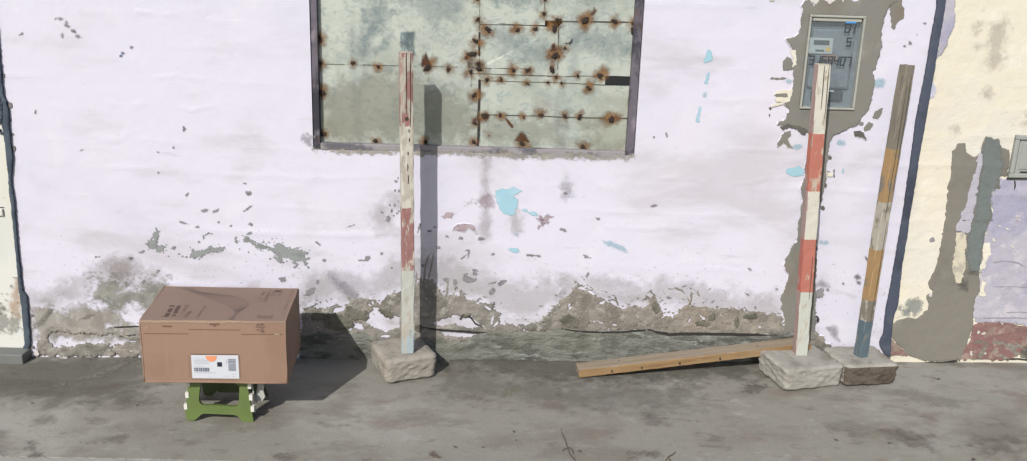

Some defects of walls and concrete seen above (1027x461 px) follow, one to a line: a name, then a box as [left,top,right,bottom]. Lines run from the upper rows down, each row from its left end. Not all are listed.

corrosion [579,8,597,29]
corrosion [421,53,436,71]
corrosion [464,17,532,100]
corrosion [511,0,567,86]
corrosion [575,67,609,93]
corrosion [470,112,531,148]
peeling [776,124,807,149]
peeling [854,108,883,141]
peeling [239,223,320,282]
peeling [414,212,785,342]
peeling [300,280,401,340]
peeling [33,327,142,358]